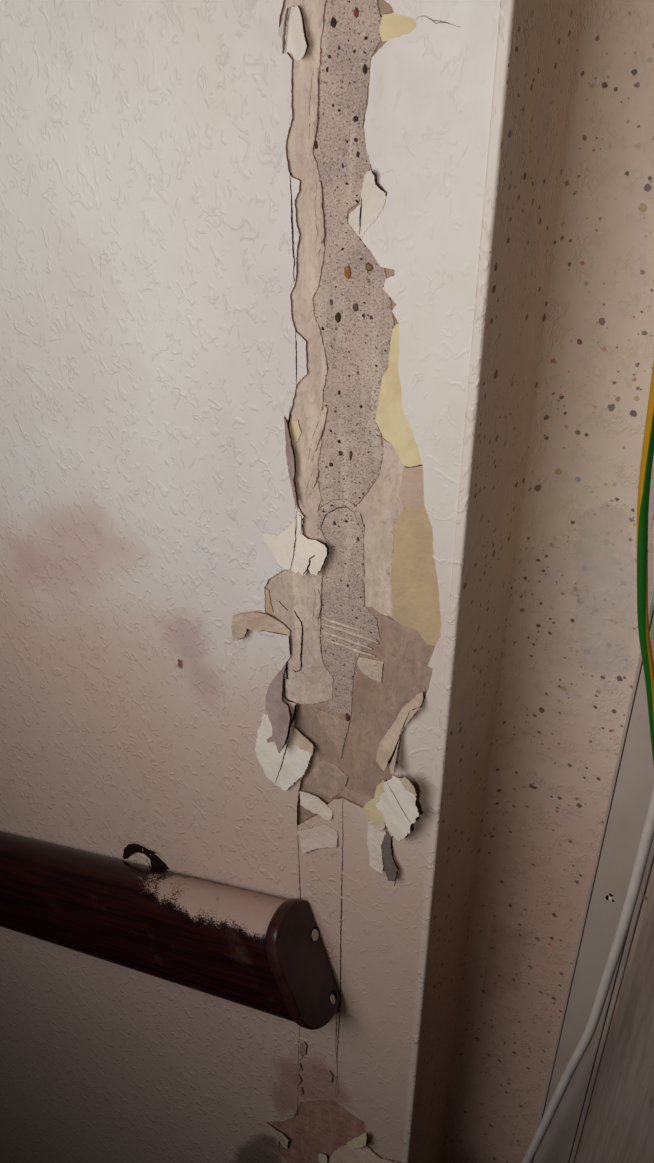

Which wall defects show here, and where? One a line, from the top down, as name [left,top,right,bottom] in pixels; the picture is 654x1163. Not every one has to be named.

crack [419,16,459,27]
spalling [265,0,442,822]
spalling [266,1042,366,1163]